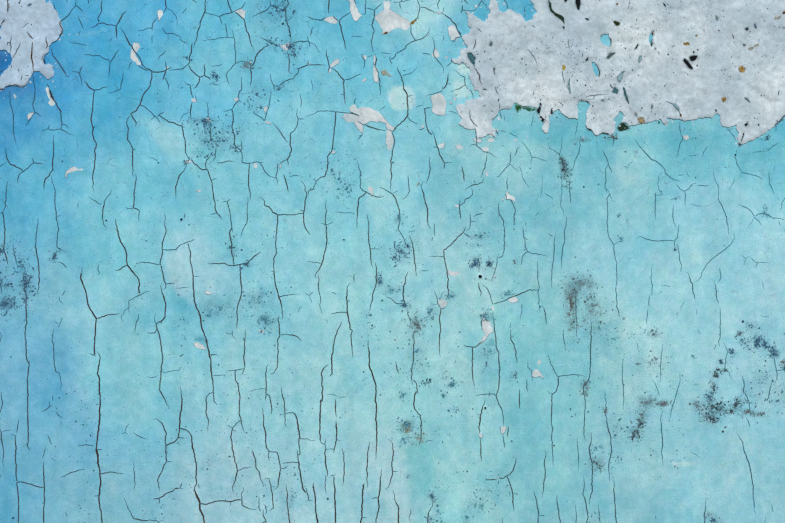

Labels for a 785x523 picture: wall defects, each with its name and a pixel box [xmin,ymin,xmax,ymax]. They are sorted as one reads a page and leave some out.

flaking render [0,0,62,106]
peeling [342,104,397,151]
flaking render [430,0,785,152]
crack [0,0,624,523]
peeling [477,306,494,346]
crack [602,101,785,523]